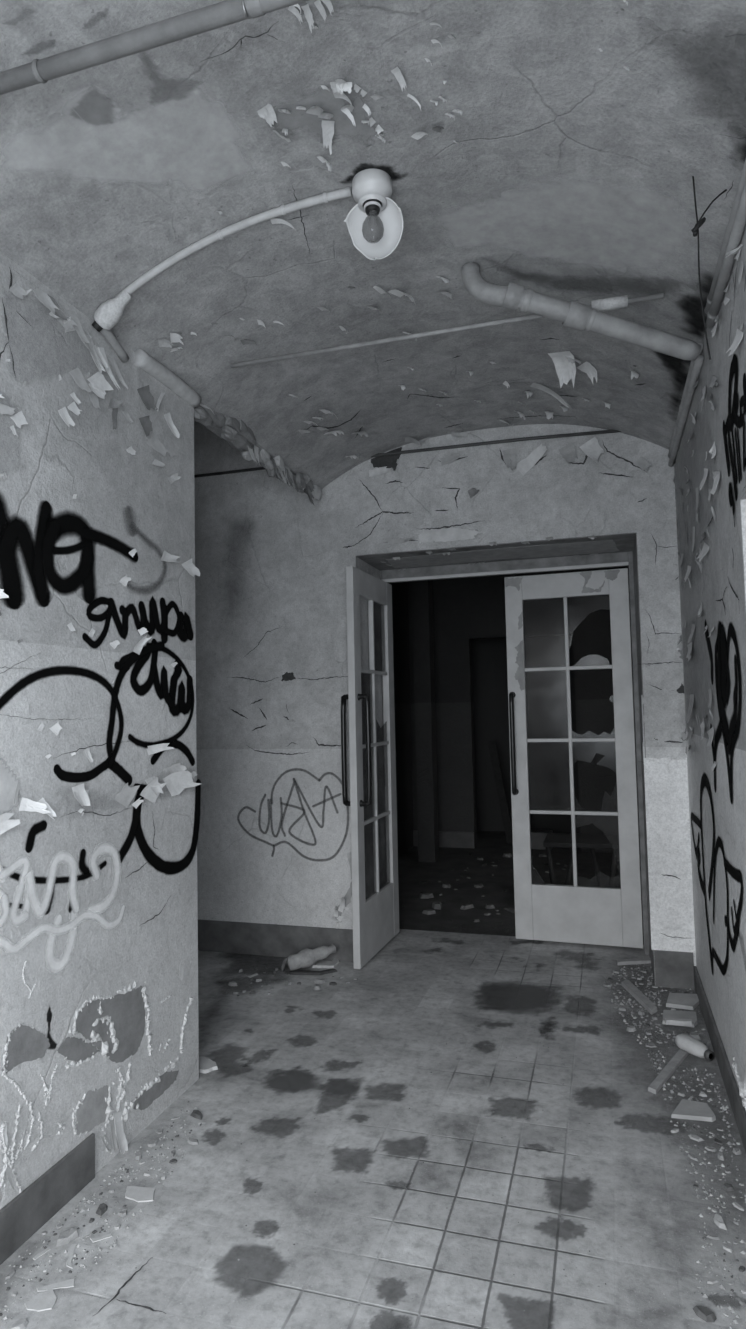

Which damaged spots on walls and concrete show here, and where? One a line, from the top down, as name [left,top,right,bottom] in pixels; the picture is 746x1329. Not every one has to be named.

peeling [257,79,386,171]
peeling [391,67,463,144]
peeling [9,284,181,484]
spalling [194,404,322,505]
crack [500,395,647,502]
crack [343,456,485,548]
crack [646,611,682,691]
spalling [0,981,194,1193]
leakage [213,1045,403,1122]
leakage [333,1149,370,1171]
leakage [217,1221,284,1294]
leakage [371,1278,411,1329]